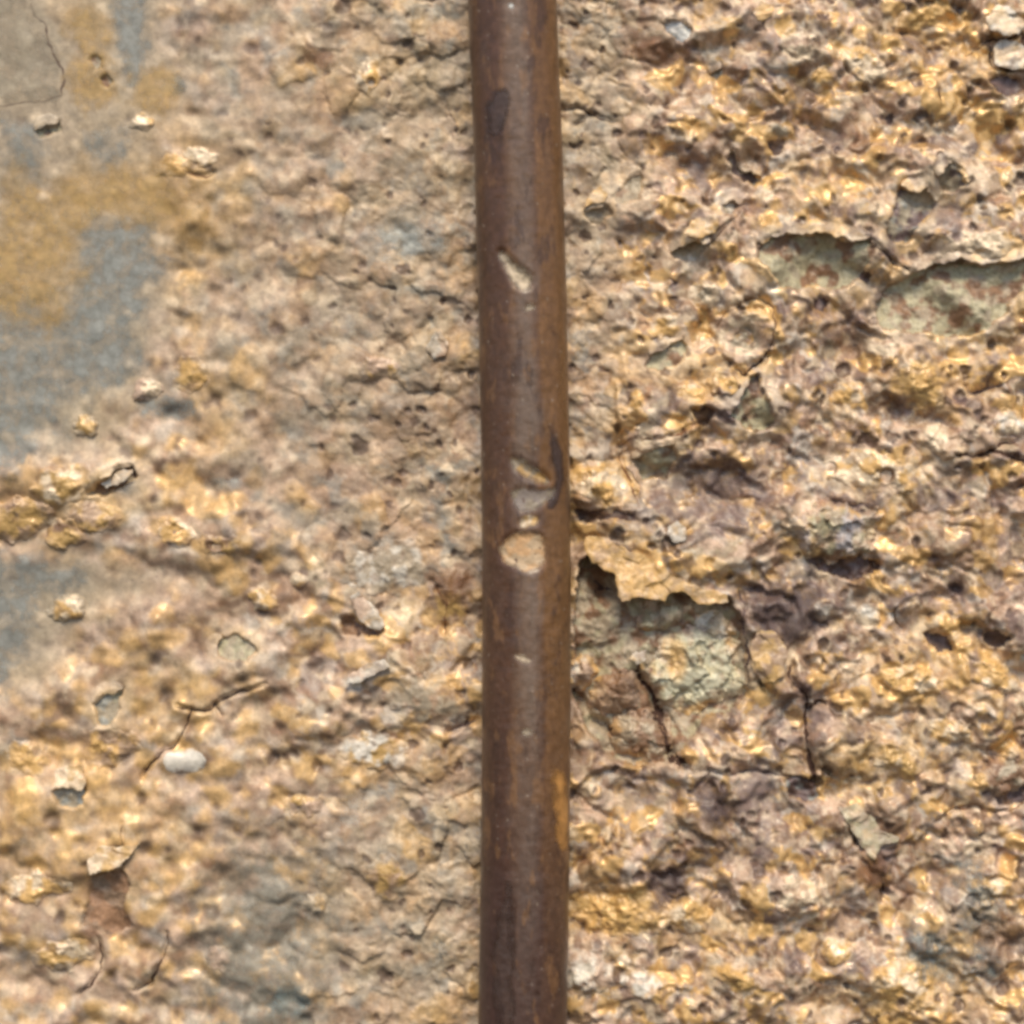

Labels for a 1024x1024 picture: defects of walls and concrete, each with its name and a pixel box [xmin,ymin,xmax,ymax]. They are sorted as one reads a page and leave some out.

peeling [758,218,874,312]
peeling [876,246,1024,337]
spalling [573,536,788,766]
crack [635,664,783,793]
crack [787,665,827,780]
rust [555,772,568,849]